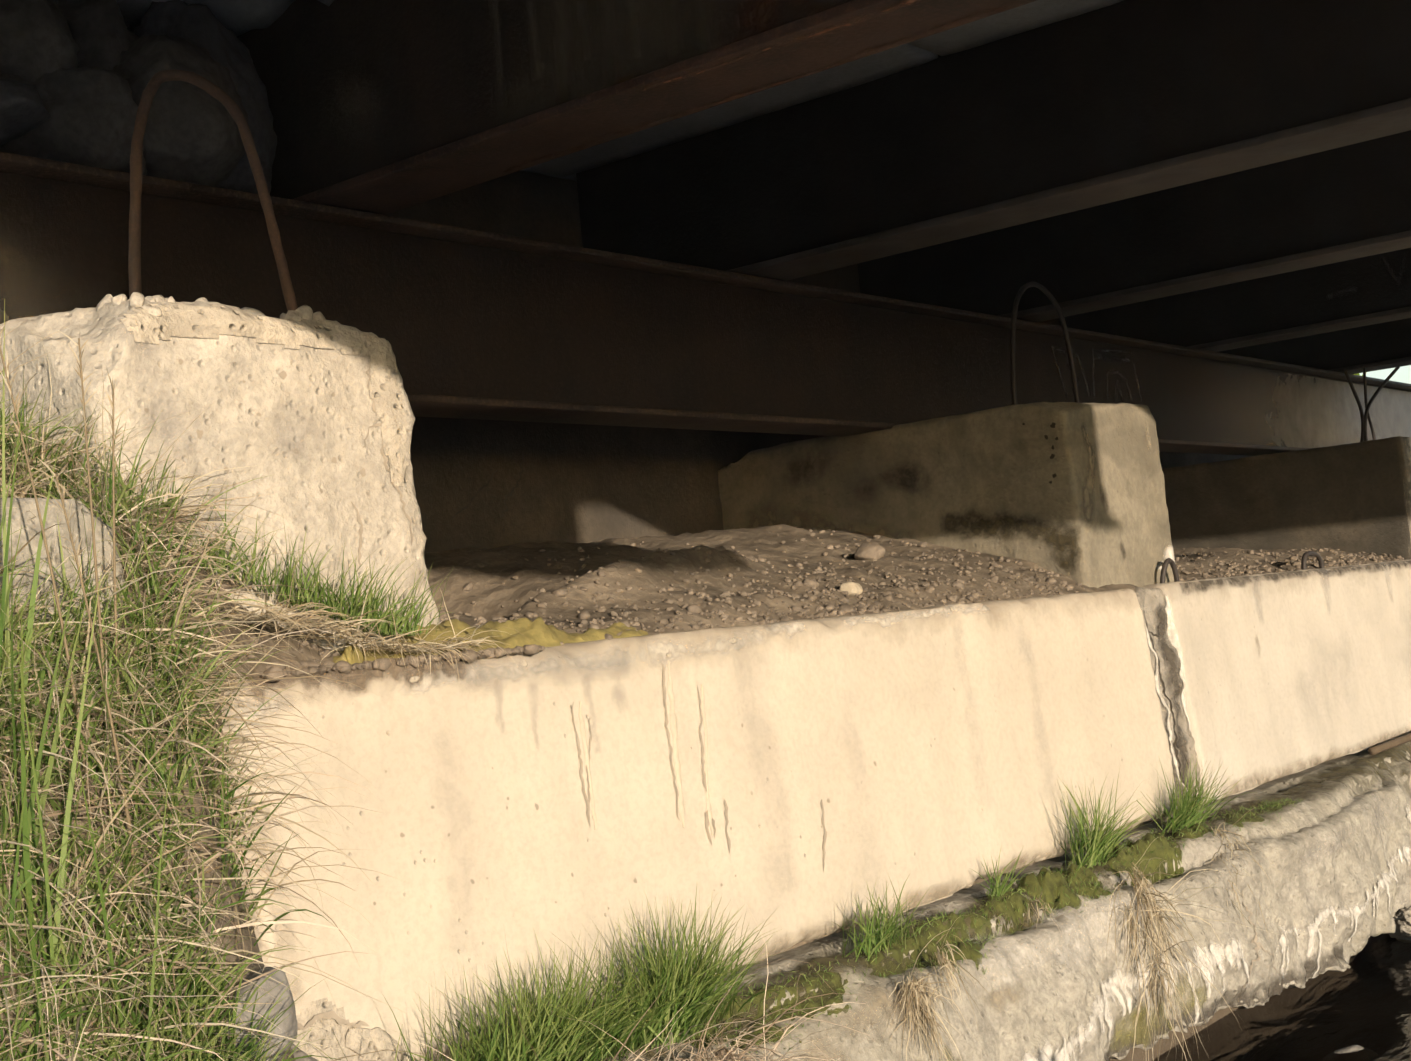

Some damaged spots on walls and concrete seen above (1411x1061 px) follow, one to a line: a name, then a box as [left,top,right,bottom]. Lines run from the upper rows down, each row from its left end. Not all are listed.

damp [1156,546,1174,569]
damp [1185,560,1411,590]
crack [571,701,597,830]
crack [662,662,731,854]
damp [1141,596,1194,804]
crack [820,801,828,872]
damp [1025,846,1411,1061]